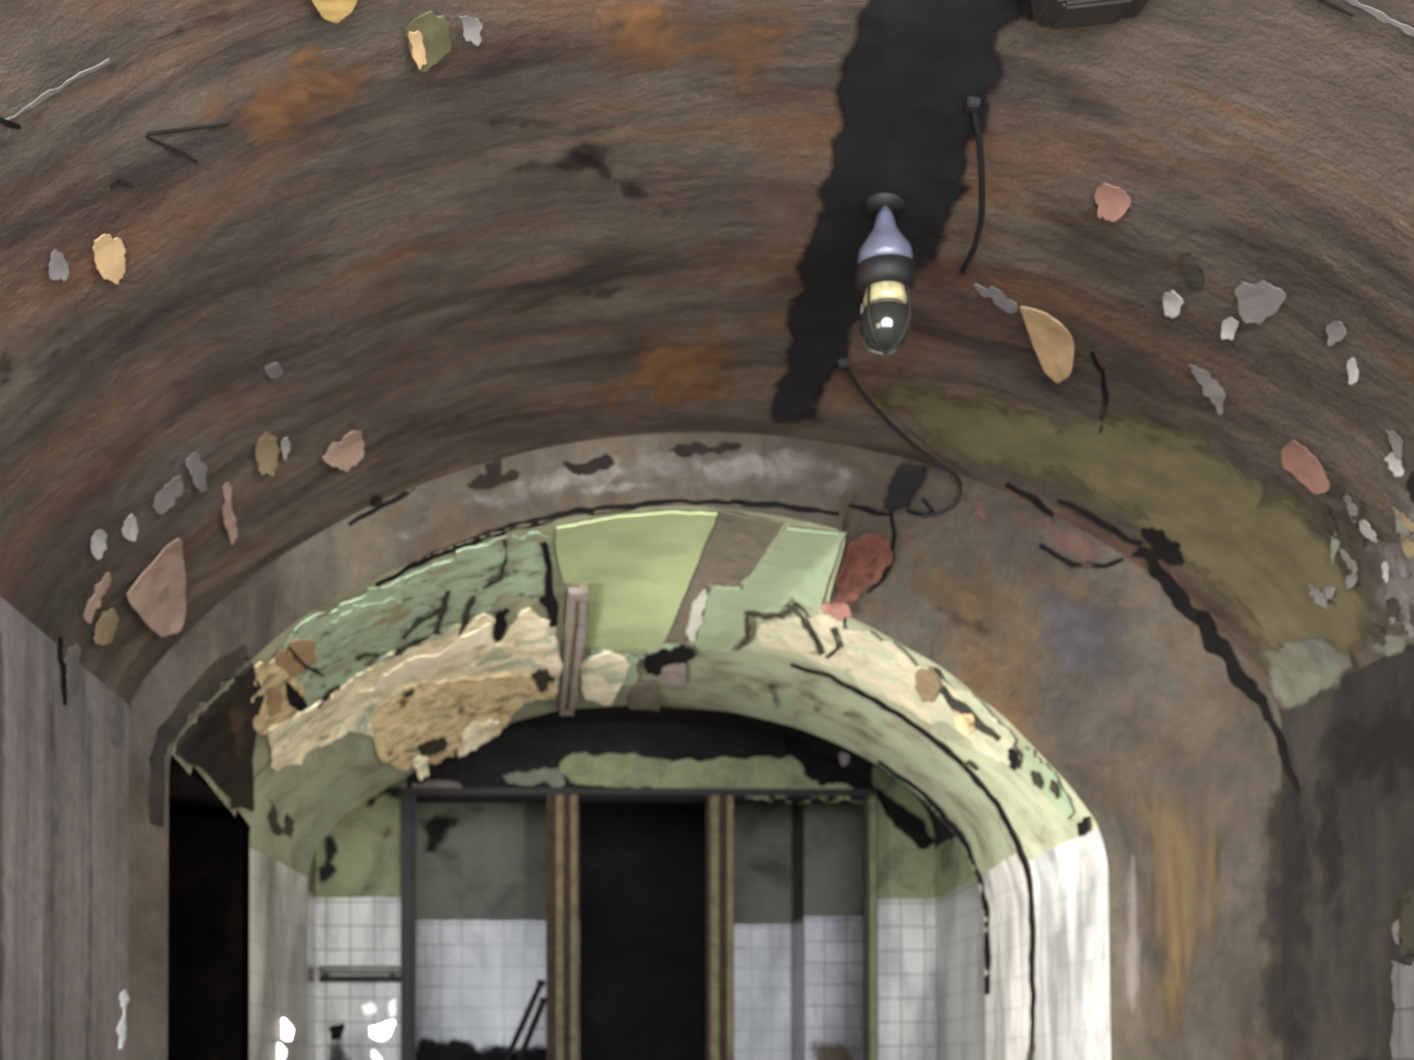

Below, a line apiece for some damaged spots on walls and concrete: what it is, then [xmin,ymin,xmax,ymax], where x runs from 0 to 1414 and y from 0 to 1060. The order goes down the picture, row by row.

peeling [312,0,357,23]
peeling [57,514,186,705]
peeling [322,431,365,472]
crack [287,463,935,708]
flaking render [149,511,1089,838]
peeling [974,284,1074,386]
peeling [1094,183,1132,222]
peeling [869,384,1414,708]
crack [1004,482,1300,794]
peeling [1221,280,1286,340]
crack [736,604,1035,1060]
water stain [1263,709,1414,1060]